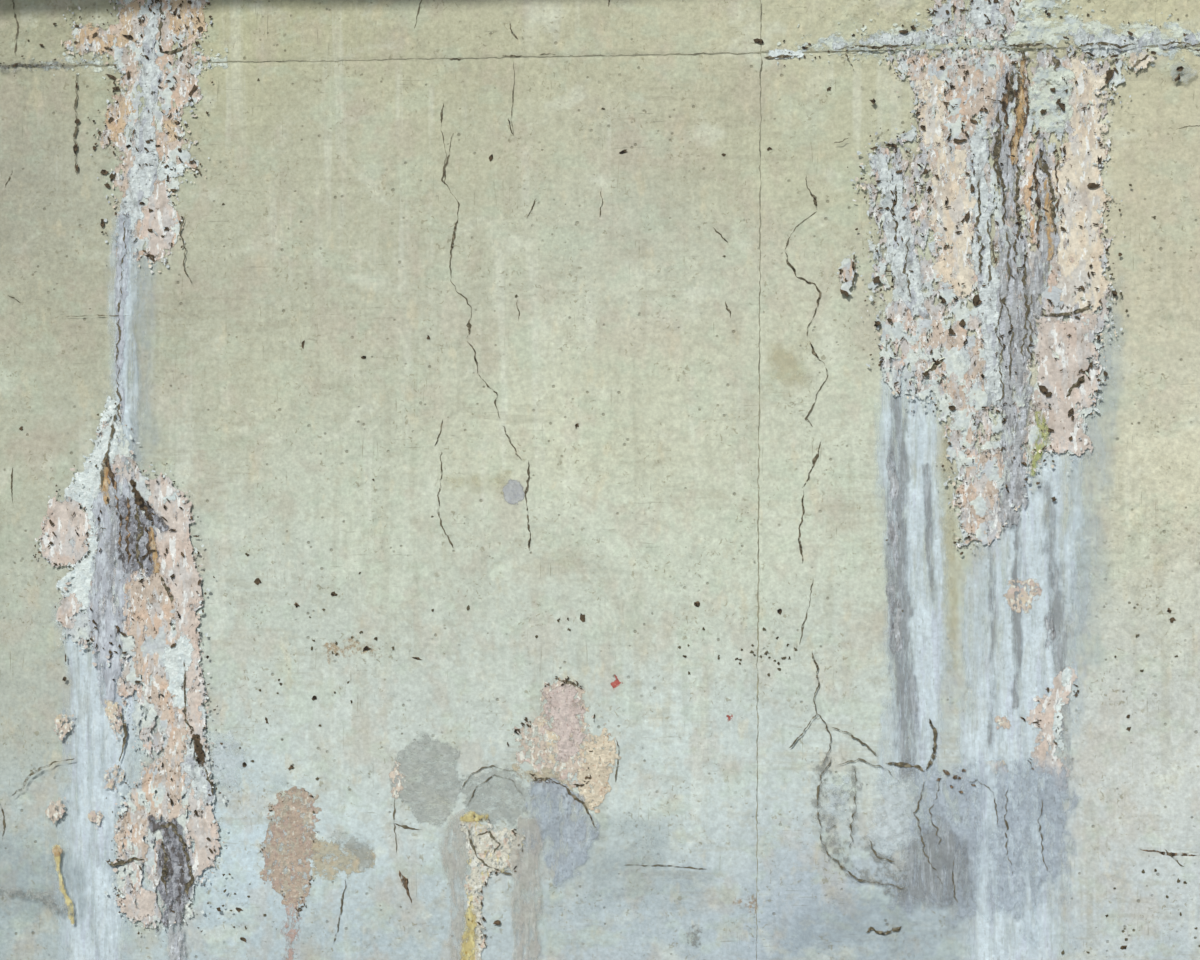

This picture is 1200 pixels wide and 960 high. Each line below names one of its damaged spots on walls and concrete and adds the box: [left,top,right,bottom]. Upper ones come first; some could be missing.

damp [7,612,140,960]
damp [96,214,137,472]
spalling [33,403,230,960]
spalling [53,0,213,278]
spalling [260,786,375,960]
crack [435,420,453,547]
crack [440,104,531,551]
spalling [460,676,621,960]
crack [785,180,878,761]
damp [878,361,947,778]
spalling [837,0,1155,555]
damp [960,448,1084,960]